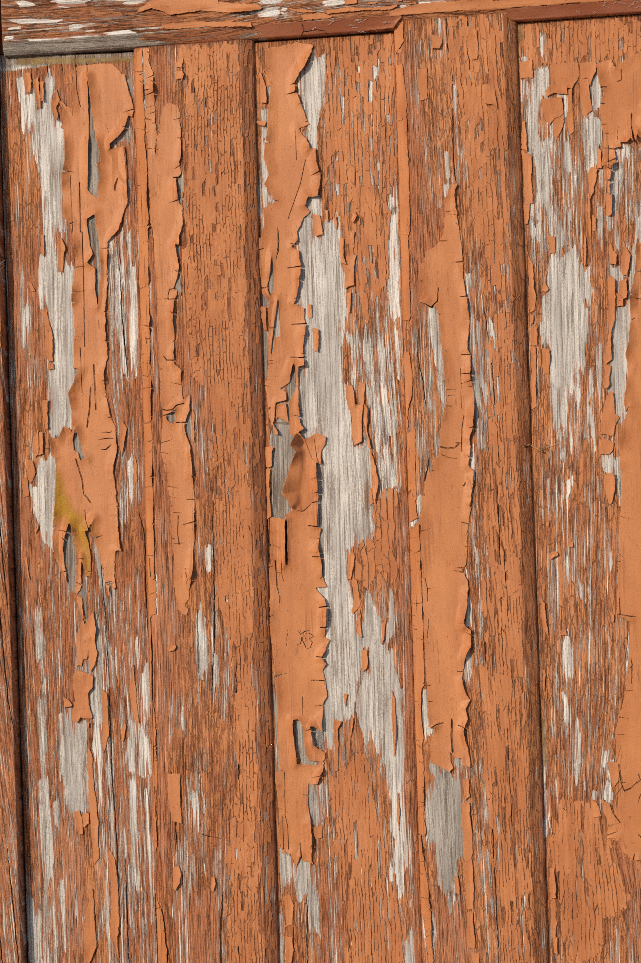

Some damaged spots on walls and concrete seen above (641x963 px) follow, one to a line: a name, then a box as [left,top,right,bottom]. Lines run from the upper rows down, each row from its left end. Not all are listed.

peeling [3,903,15,963]
peeling [4,0,136,41]
peeling [15,48,229,963]
peeling [256,42,408,963]
peeling [113,0,641,54]
peeling [382,63,499,963]
crack [446,14,641,963]
peeling [519,33,641,861]